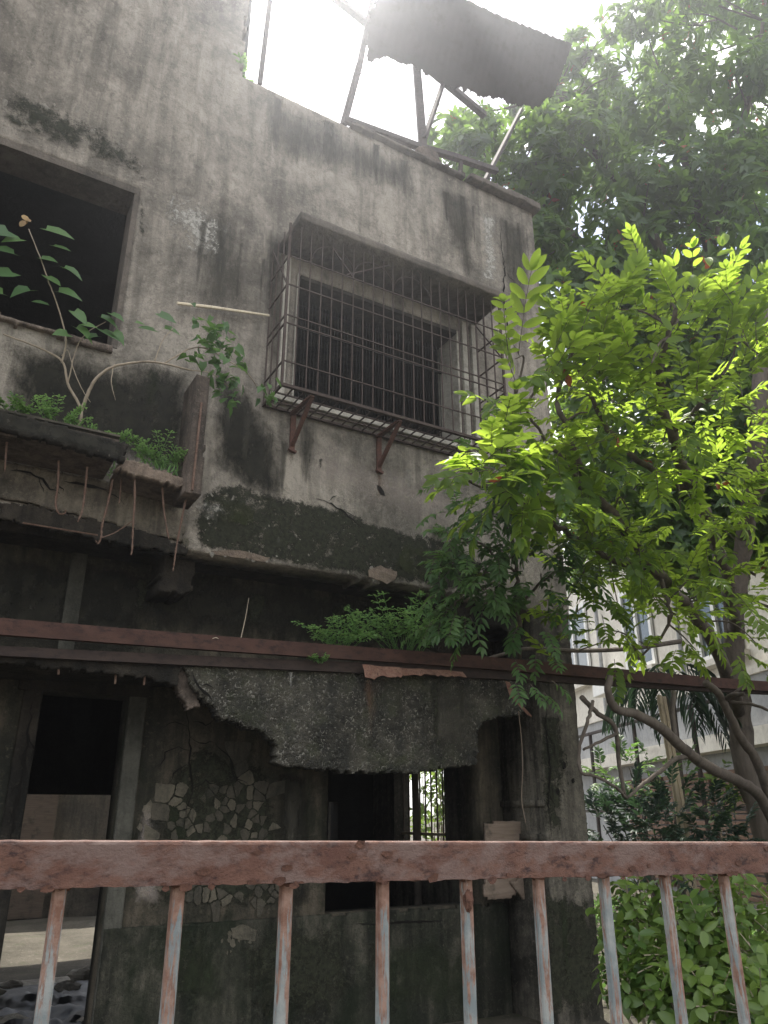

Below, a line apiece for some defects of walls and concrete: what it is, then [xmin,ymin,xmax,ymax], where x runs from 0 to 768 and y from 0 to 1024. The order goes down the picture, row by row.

leakage [445,193,524,301]
leakage [215,375,287,493]
spalling [0,461,278,571]
spalling [368,553,398,584]
crack [143,671,286,841]
peeling [137,800,153,832]
crack [153,884,279,922]